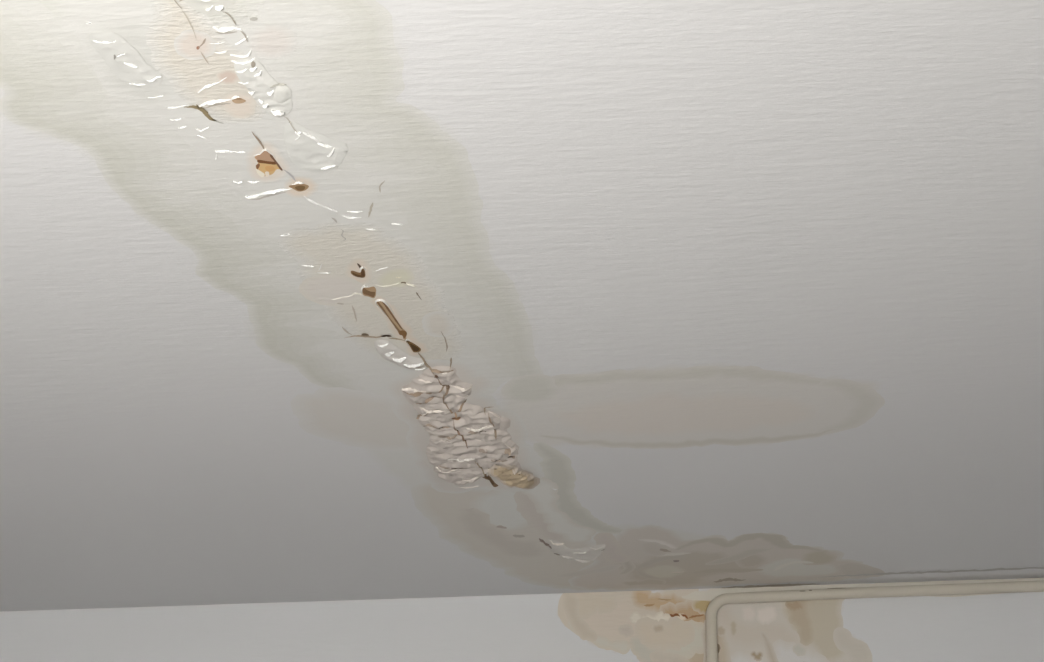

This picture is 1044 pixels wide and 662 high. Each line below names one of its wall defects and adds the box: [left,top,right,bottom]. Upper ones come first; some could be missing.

crack [174,0,258,64]
crack [186,103,231,124]
peeling [148,26,285,139]
crack [250,169,296,200]
spalling [215,149,376,230]
peeling [295,132,336,170]
leakage [0,0,885,575]
crack [337,303,515,476]
peeling [331,263,522,488]
leakage [290,381,1044,602]
leakage [557,591,704,662]
leakage [717,599,872,662]